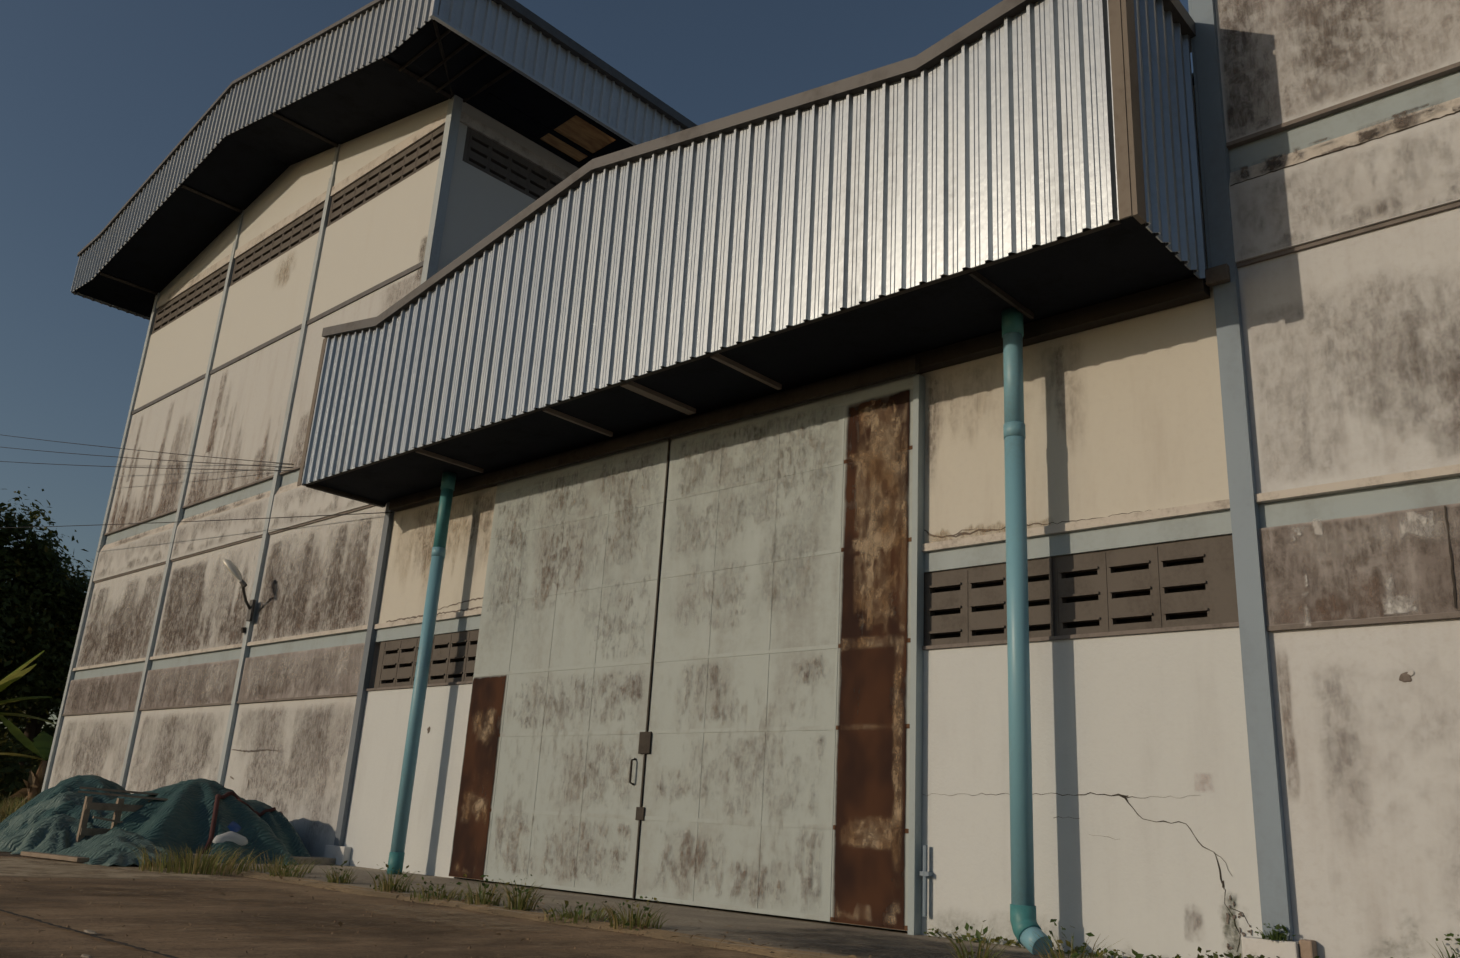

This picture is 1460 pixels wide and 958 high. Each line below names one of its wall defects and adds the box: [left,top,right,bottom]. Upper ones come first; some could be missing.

spalling [1231,104,1460,186]
leakage [109,376,271,543]
leakage [66,521,370,788]
rust [833,390,910,930]
peeling [1293,519,1323,541]
peeling [1385,577,1417,614]
peeling [1381,511,1433,536]
rust [449,675,506,880]
crack [923,792,1248,951]